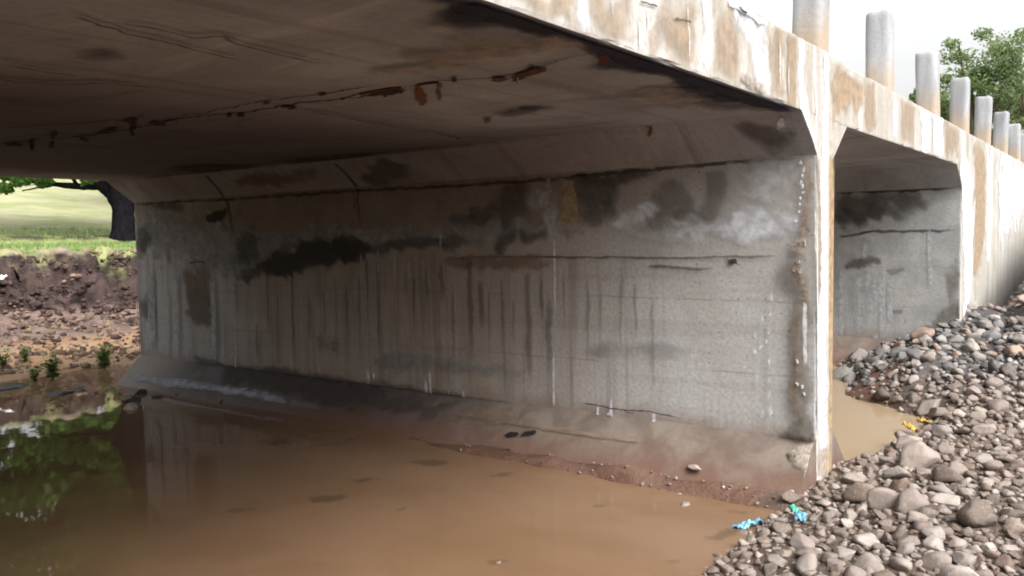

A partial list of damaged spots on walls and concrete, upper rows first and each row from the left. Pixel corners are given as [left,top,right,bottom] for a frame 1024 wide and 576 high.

crack [0,57,571,150]
corrosion [414,78,457,106]
corrosion [833,70,863,118]
damp [433,0,892,479]
damp [136,267,305,377]